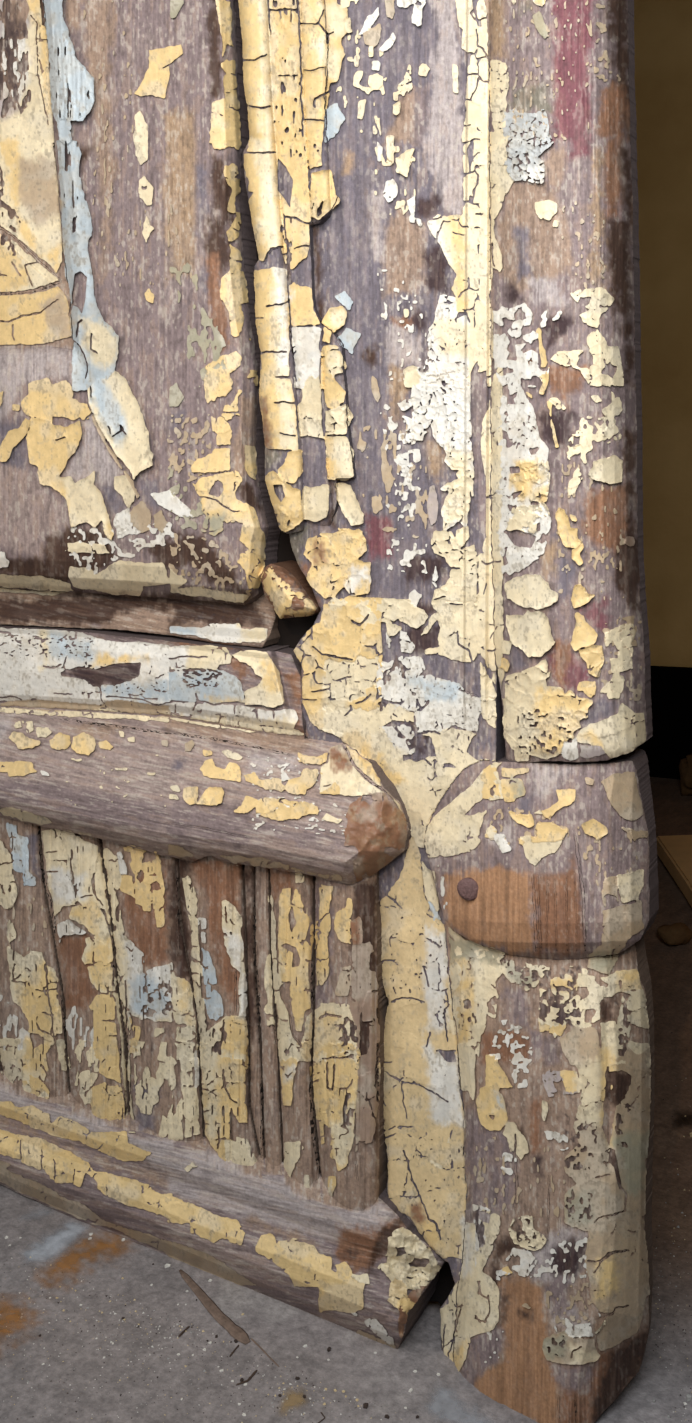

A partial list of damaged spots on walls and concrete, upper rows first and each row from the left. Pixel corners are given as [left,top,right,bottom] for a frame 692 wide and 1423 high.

peeling [0,0,317,619]
peeling [0,761,49,777]
peeling [0,623,304,761]
peeling [160,785,224,807]
peeling [200,0,651,1371]
peeling [0,807,257,1286]